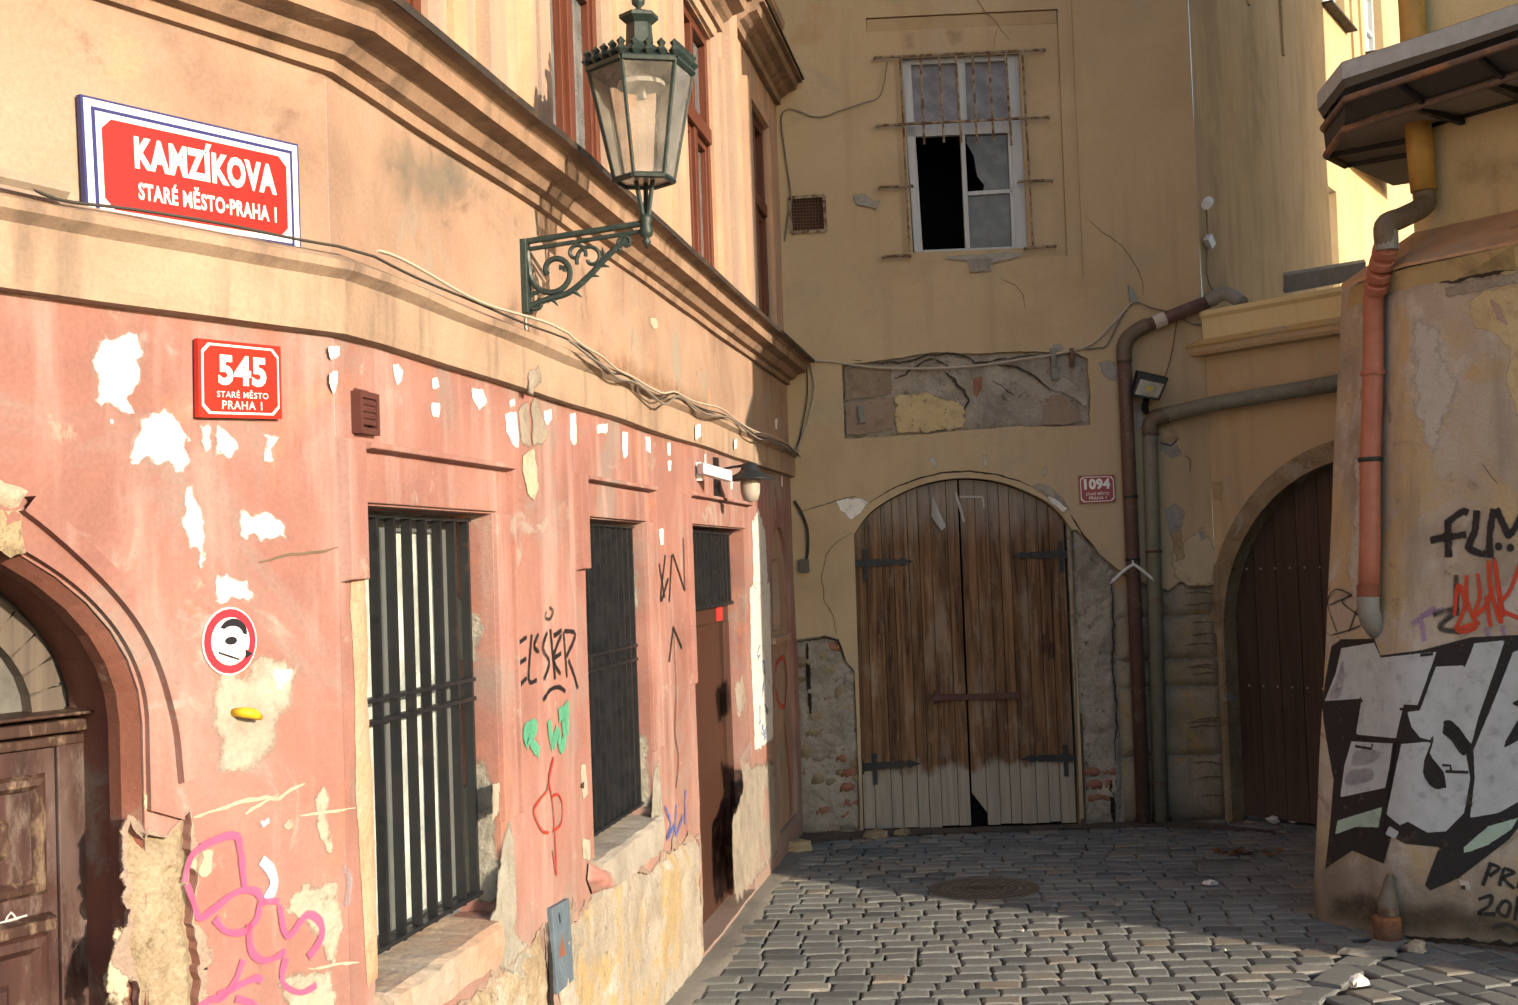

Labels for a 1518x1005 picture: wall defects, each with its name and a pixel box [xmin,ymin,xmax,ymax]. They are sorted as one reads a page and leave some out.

flaking render [103,580,378,1005]
flaking render [492,783,500,820]
flaking render [458,828,703,1005]